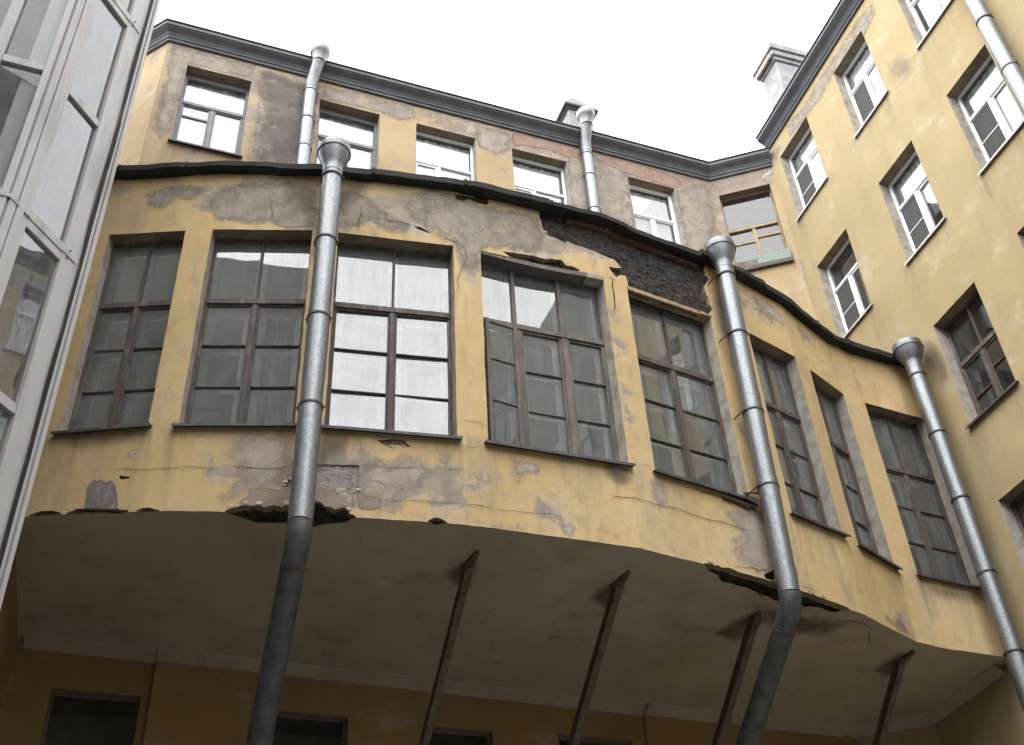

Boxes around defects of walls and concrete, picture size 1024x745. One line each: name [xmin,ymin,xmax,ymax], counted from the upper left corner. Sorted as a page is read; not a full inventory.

water stain [253,73,305,163]
peeling [147,185,203,207]
peeling [210,182,317,228]
flaking render [340,127,715,316]
flaking render [36,478,124,515]
peeling [227,432,293,522]
peeling [313,438,429,525]
crack [609,490,768,598]
flaking render [800,588,839,611]